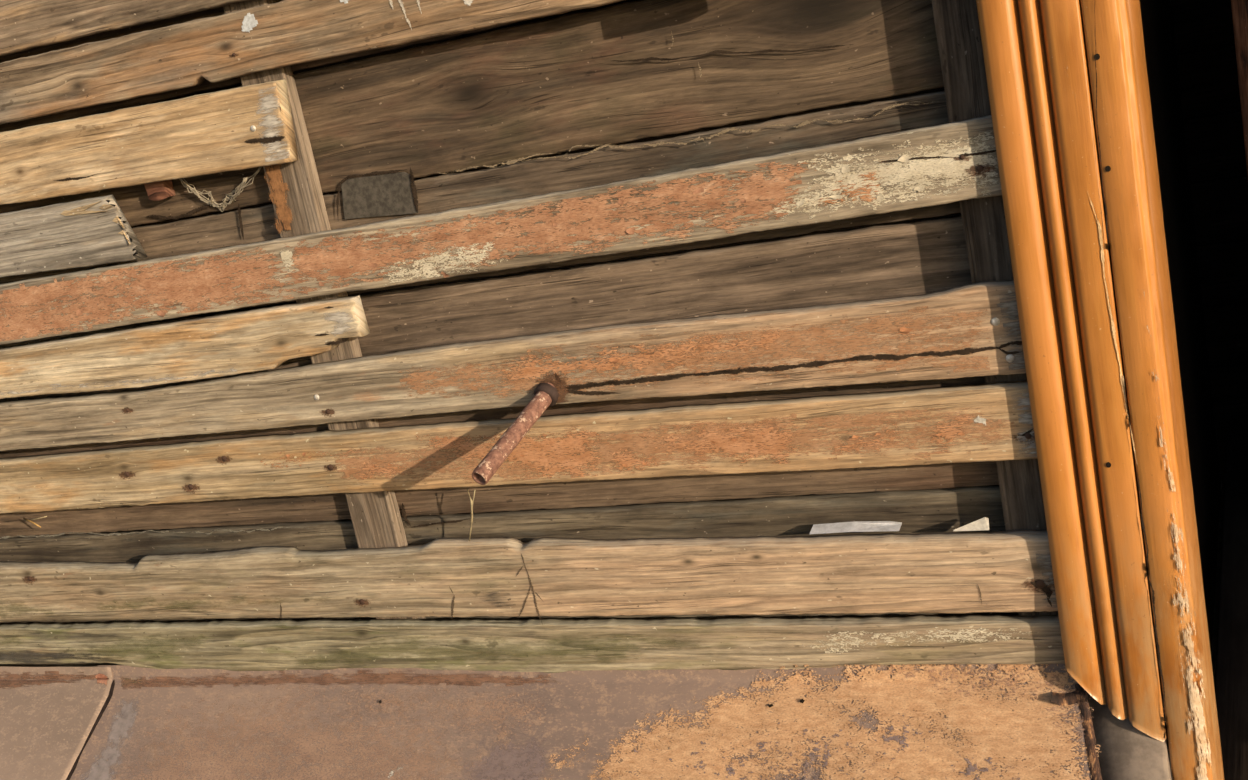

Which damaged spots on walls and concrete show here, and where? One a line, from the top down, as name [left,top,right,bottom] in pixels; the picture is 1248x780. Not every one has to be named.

crack [878,150,996,163]
crack [1094,3,1109,249]
peeling [0,130,1000,342]
peeling [399,306,990,398]
crack [555,341,1022,395]